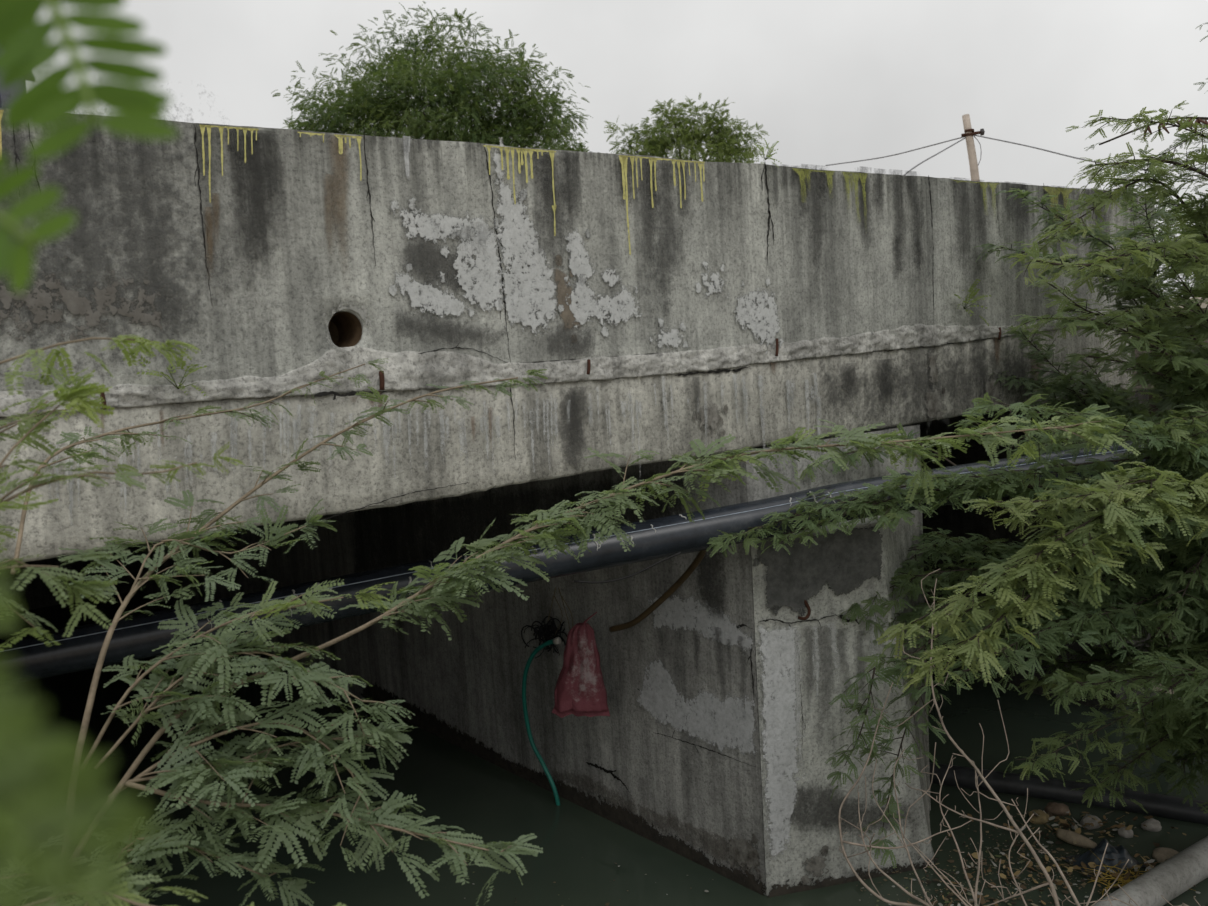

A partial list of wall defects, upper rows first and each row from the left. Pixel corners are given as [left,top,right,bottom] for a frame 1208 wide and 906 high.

crack [194,126,212,303]
crack [364,134,376,264]
peeling [389,137,642,342]
leakage [457,142,592,243]
leakage [619,155,705,281]
crack [761,163,774,265]
leakage [773,164,923,270]
crack [418,147,516,460]
peeling [650,318,688,352]
peeling [696,261,784,355]
peeling [358,526,938,898]